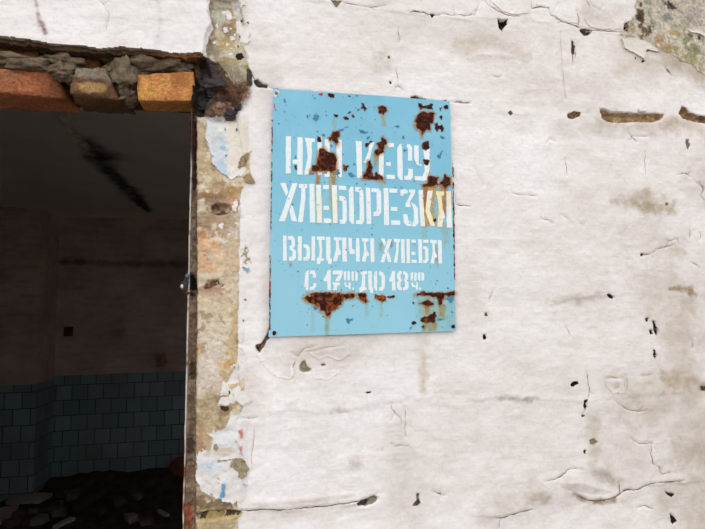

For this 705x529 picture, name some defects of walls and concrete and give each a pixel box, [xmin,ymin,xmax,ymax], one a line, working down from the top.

peeling [620,0,705,76]
flaking render [600,107,664,123]
flaking render [679,107,705,124]
flaking render [0,0,267,529]
crack [244,493,377,511]
crack [582,439,683,509]